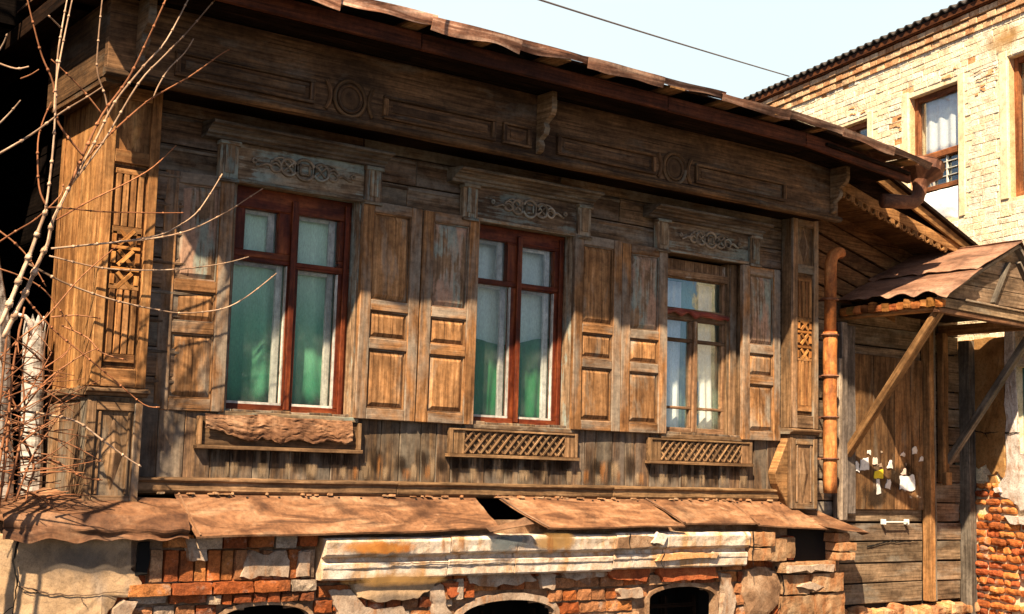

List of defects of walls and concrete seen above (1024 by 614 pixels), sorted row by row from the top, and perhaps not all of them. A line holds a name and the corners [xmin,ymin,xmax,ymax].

flaking render [954,331,1024,614]
flaking render [184,538,208,562]
flaking render [240,550,311,579]
flaking render [328,531,737,614]